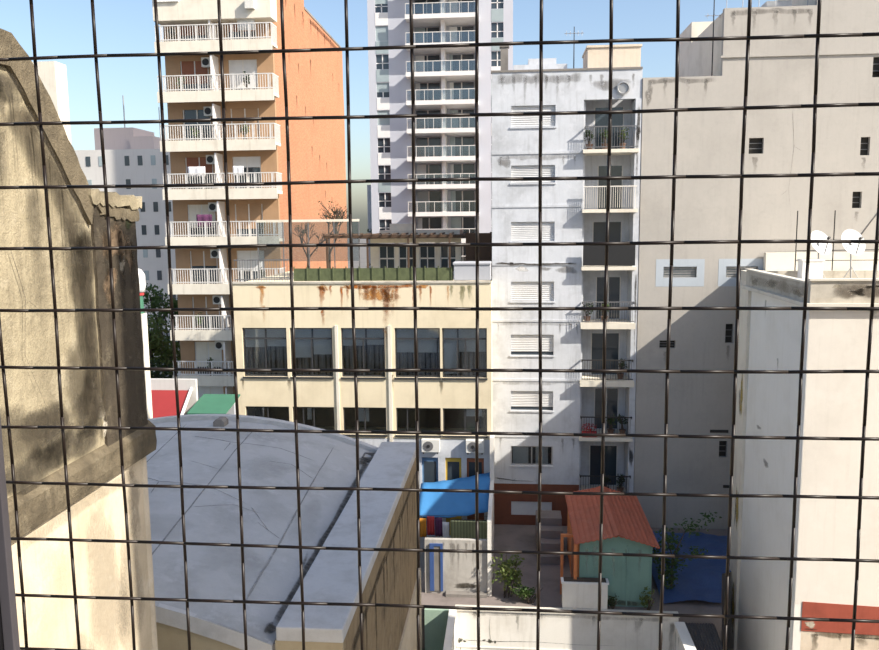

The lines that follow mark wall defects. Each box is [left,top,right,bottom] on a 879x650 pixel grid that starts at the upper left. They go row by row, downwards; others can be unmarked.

water stain [27,112,65,185]
water stain [104,231,135,295]
corrosion [319,284,432,307]
water stain [5,313,99,494]